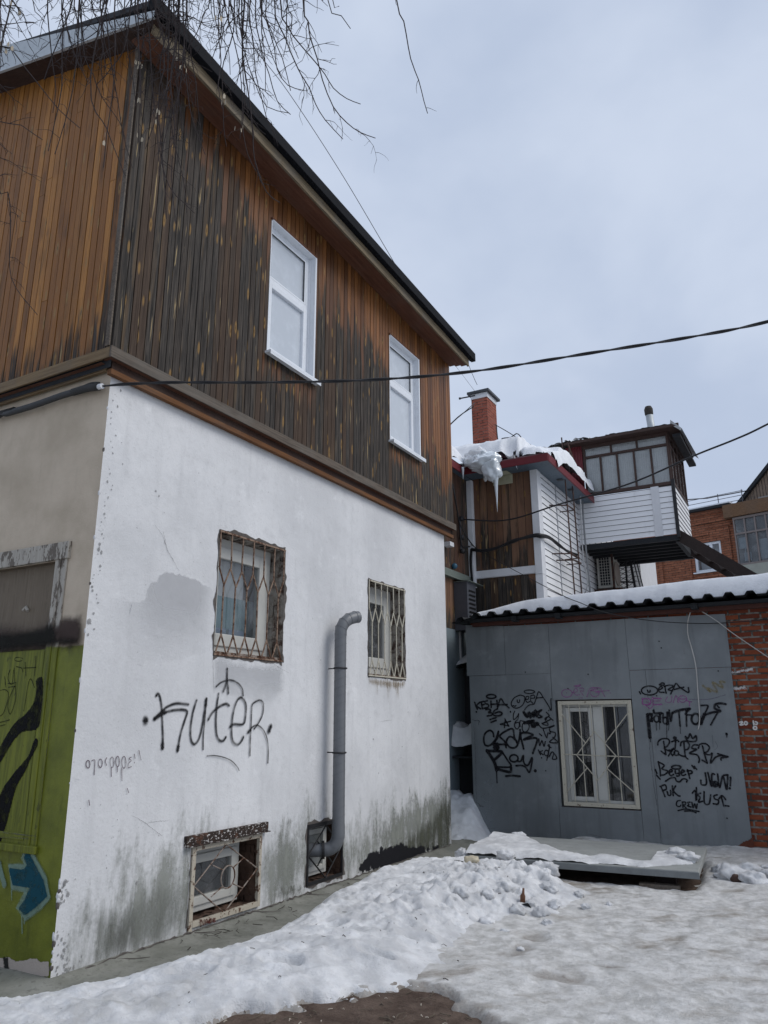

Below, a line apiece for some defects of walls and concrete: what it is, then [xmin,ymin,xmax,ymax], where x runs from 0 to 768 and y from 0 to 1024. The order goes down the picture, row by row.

damp [98,853,190,950]
damp [264,834,307,905]
damp [343,791,451,878]
spalling [359,842,439,873]